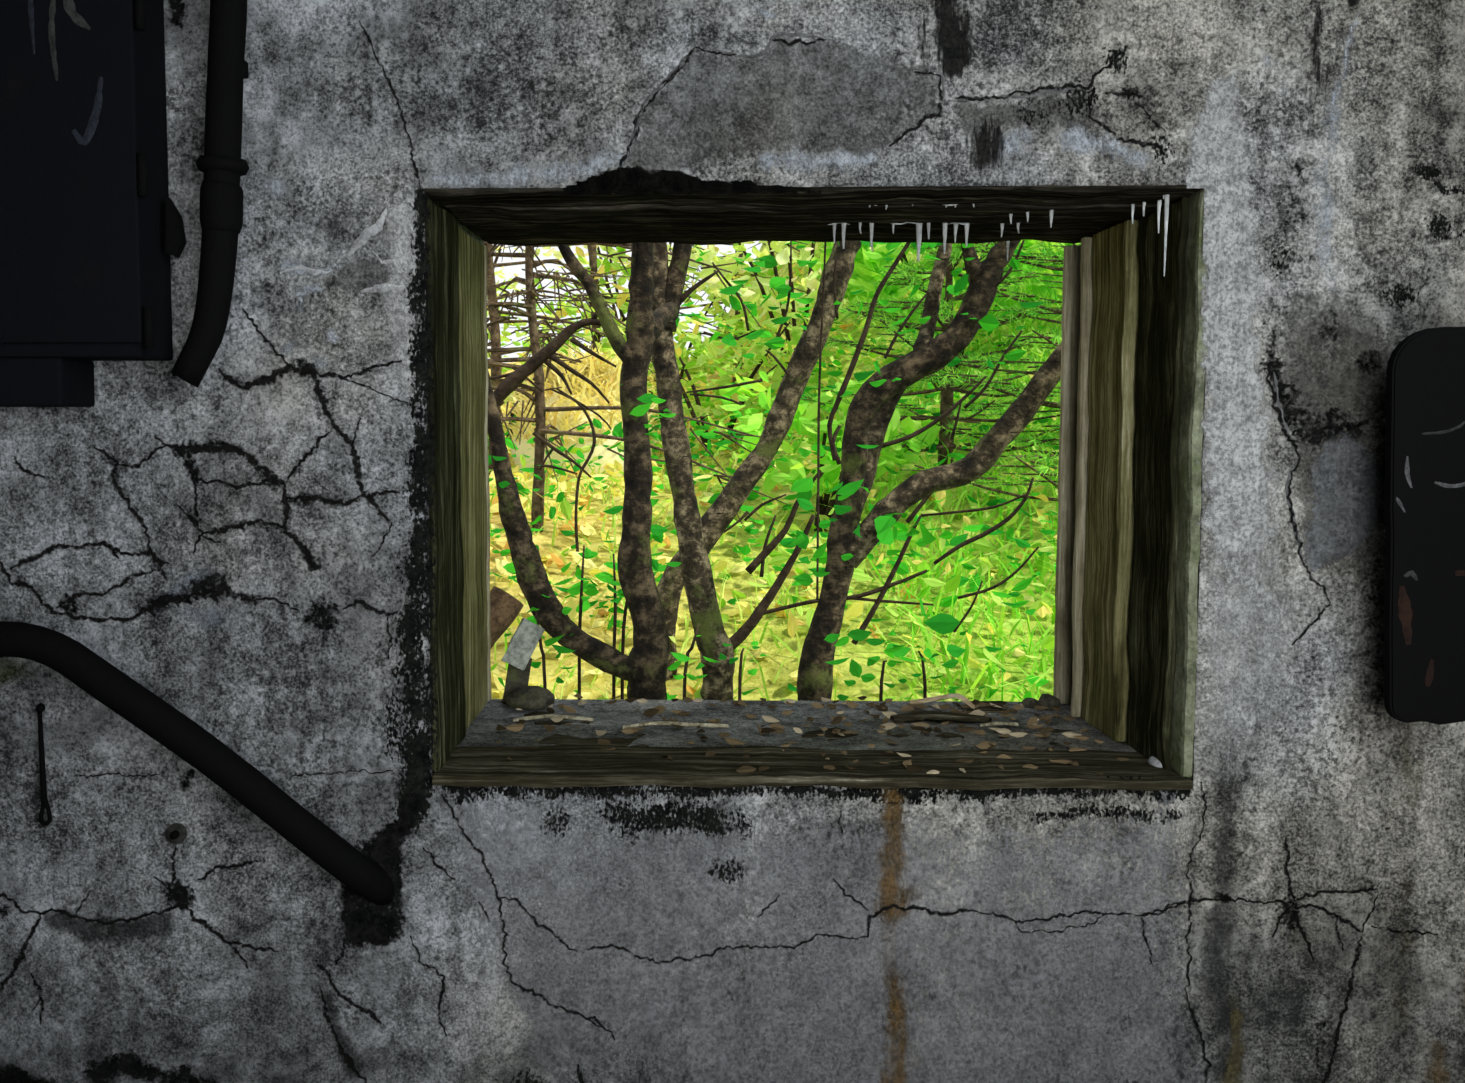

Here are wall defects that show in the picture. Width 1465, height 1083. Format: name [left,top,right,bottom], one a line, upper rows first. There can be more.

crack [619,46,737,171]
water stain [918,0,971,80]
crack [889,53,1166,155]
water stain [966,81,1175,173]
crack [0,308,408,623]
water stain [339,151,1195,951]
crack [1265,369,1331,645]
crack [0,844,279,1025]
corrosion [881,789,905,917]
crack [423,781,1439,1083]
water stain [1194,771,1244,1083]
water stain [1274,894,1301,935]